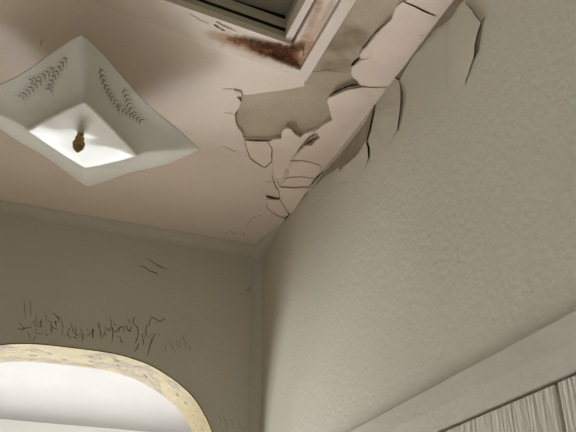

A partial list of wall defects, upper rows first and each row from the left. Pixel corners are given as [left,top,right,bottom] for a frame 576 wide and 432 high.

crack [230,89,289,220]
corrosion [223,36,310,69]
peeling [235,0,483,216]
crack [19,302,190,355]